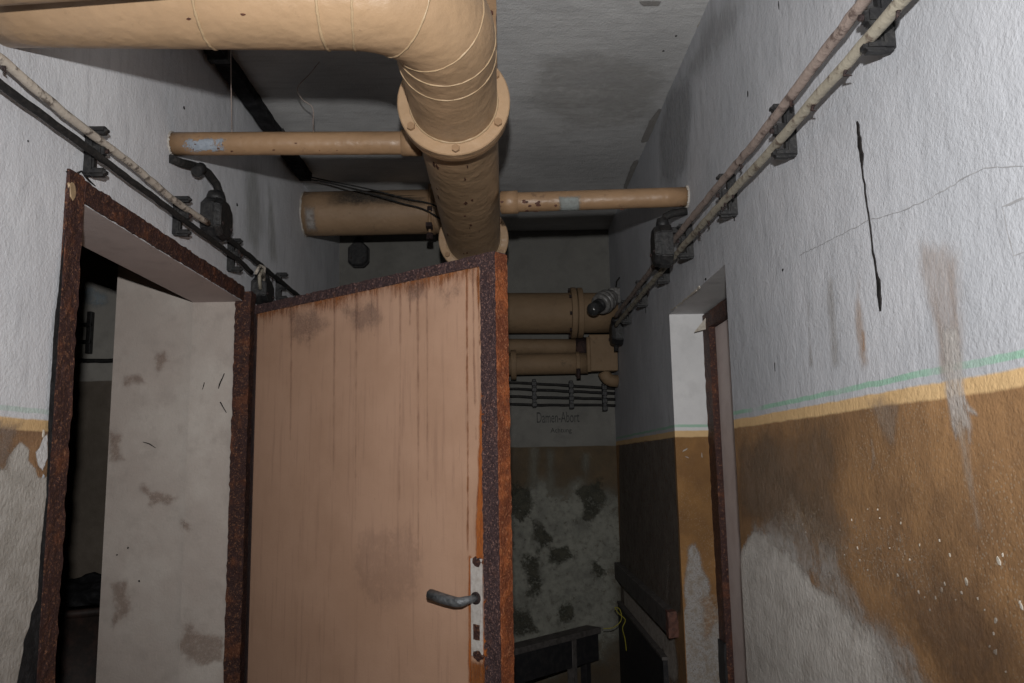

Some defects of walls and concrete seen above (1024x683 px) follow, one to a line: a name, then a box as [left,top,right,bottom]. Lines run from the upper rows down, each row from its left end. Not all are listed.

crack [801,121,1024,311]
peeling [0,223,66,683]
mould [513,609,538,635]
mould [511,485,572,597]
mould [576,481,606,521]
peeling [511,448,720,683]
efflorescence [943,330,975,484]